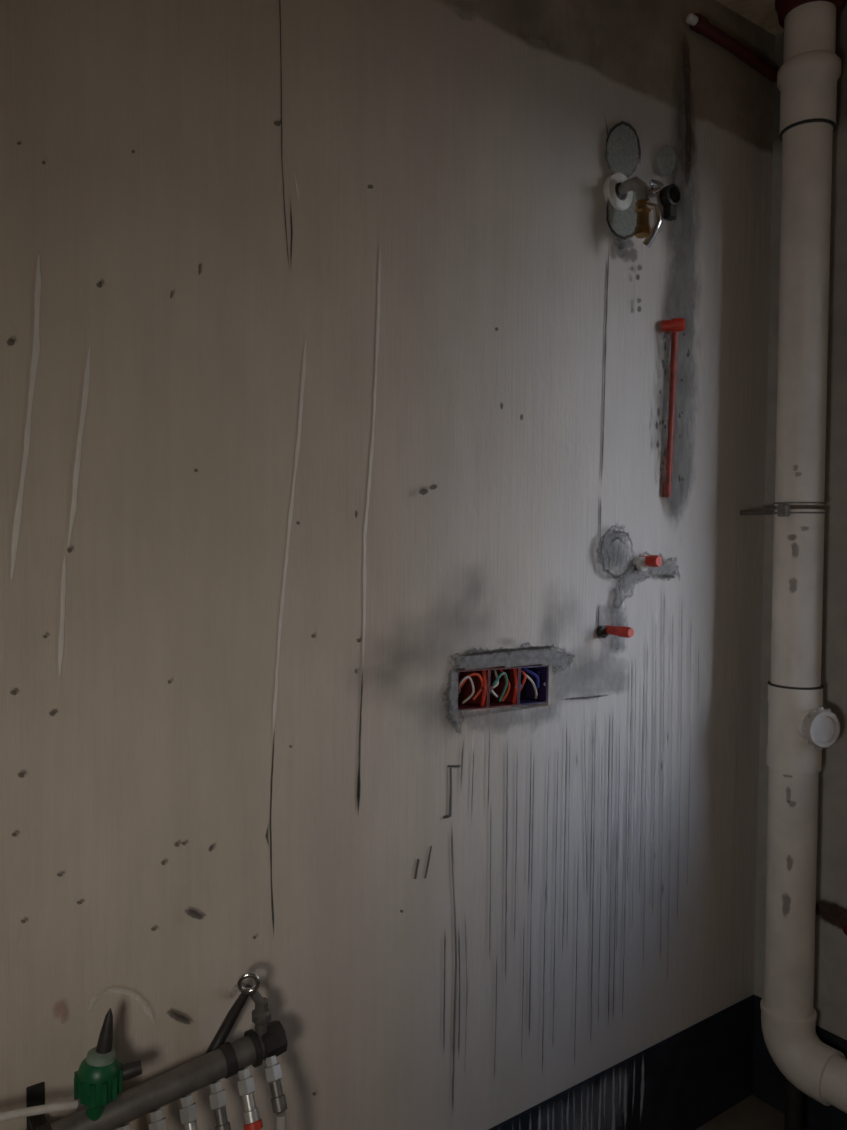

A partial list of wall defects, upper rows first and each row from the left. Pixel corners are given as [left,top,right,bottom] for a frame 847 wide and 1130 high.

crack [279,0,293,263]
crack [266,739,274,932]